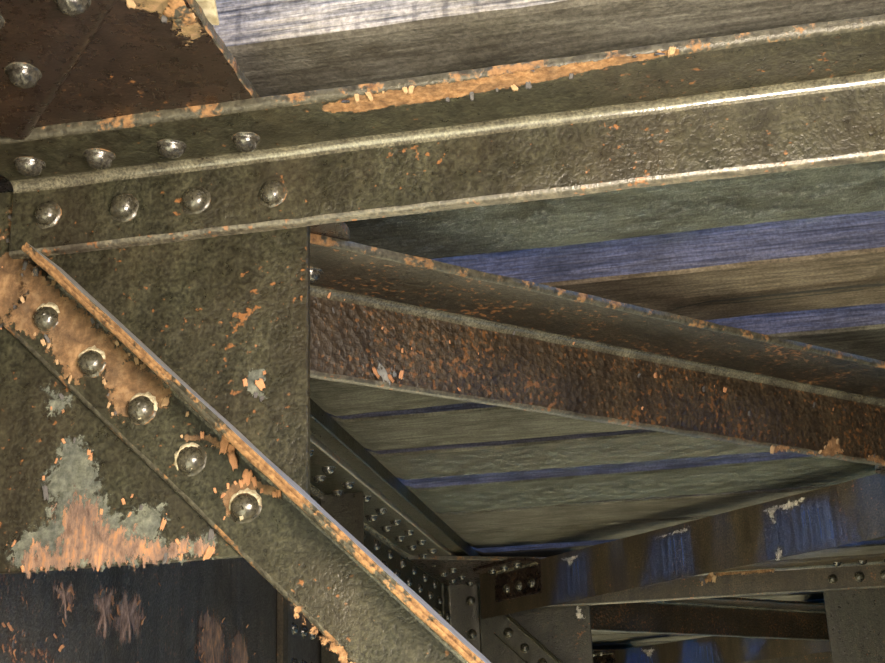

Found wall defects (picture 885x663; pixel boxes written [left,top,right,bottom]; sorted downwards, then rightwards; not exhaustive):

peeling [0,201,171,423]
peeling [174,432,281,521]
rust [770,436,844,457]
rust [867,454,885,466]
peeling [2,434,223,661]
rust [198,607,256,663]
peeling [288,598,356,663]